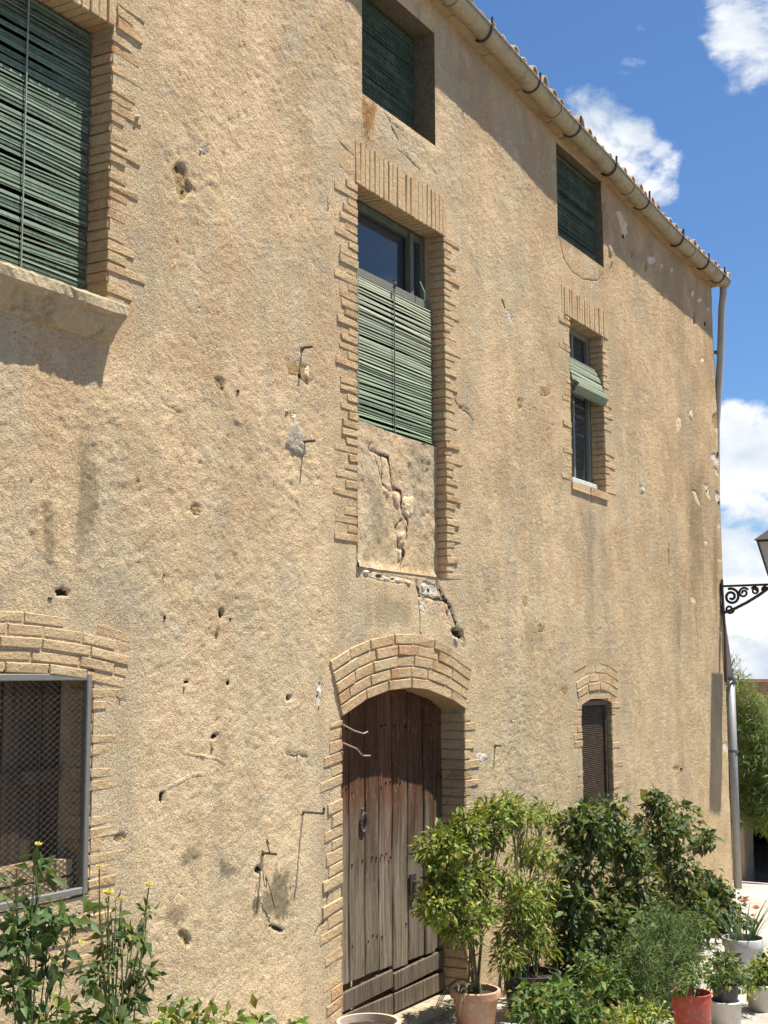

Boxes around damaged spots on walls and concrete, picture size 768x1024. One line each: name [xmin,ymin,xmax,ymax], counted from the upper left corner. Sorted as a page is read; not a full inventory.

corrosion [362,100,375,139]
flaking render [172,163,189,200]
flaking render [616,211,628,239]
crack [368,448,463,646]
water stain [253,870,289,918]